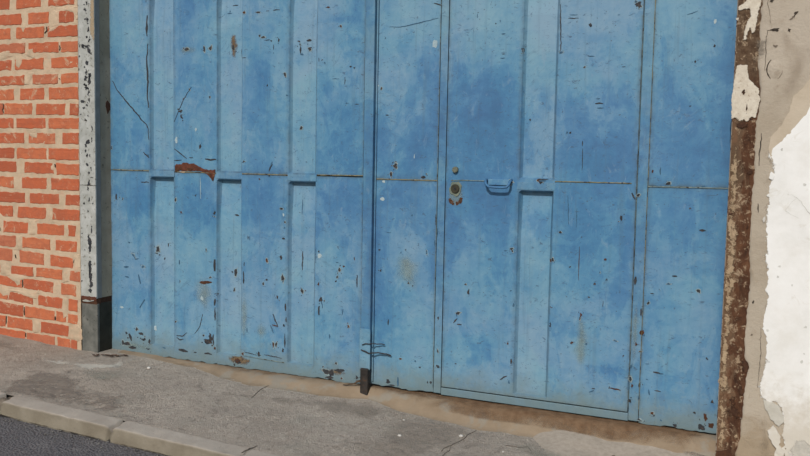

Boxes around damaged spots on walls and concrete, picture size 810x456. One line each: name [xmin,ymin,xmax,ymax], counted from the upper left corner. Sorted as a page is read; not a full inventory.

peeling [736,0,773,40]
peeling [731,64,761,121]
corrosion [175,163,215,181]
peeling [758,80,810,456]
corrosion [81,295,112,305]